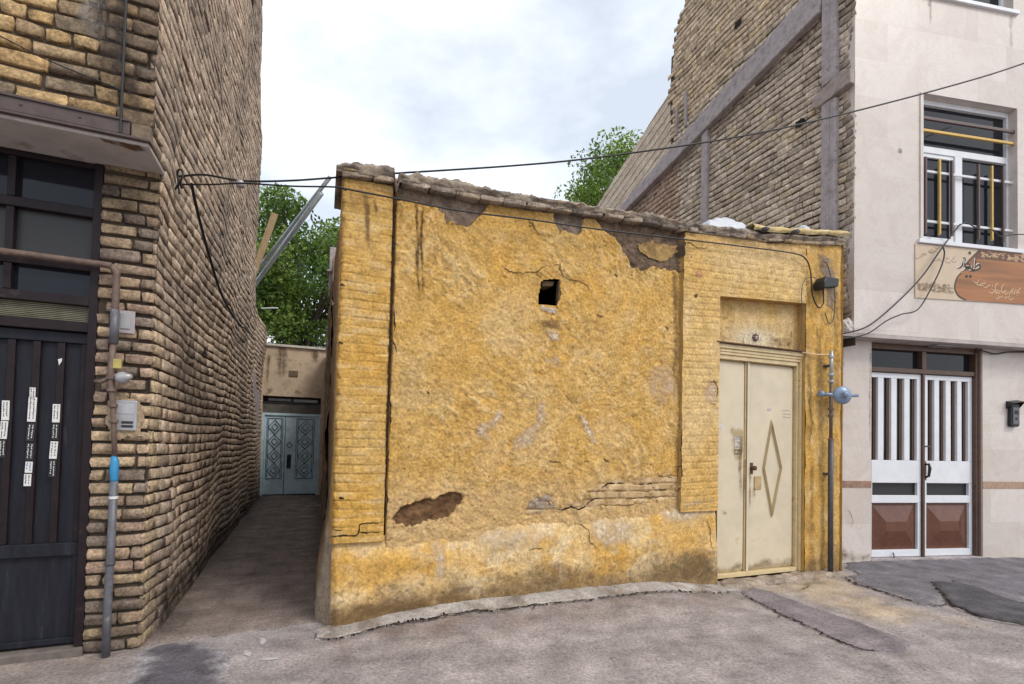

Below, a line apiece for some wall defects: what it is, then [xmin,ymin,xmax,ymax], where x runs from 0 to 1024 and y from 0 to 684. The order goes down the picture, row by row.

spalling [397,185,488,226]
spalling [554,213,583,234]
water stain [416,205,424,286]
spalling [596,220,702,277]
crack [505,264,591,292]
crack [329,185,397,538]
spalling [393,492,466,527]
efflorescence [591,519,629,545]
water stain [335,596,472,624]